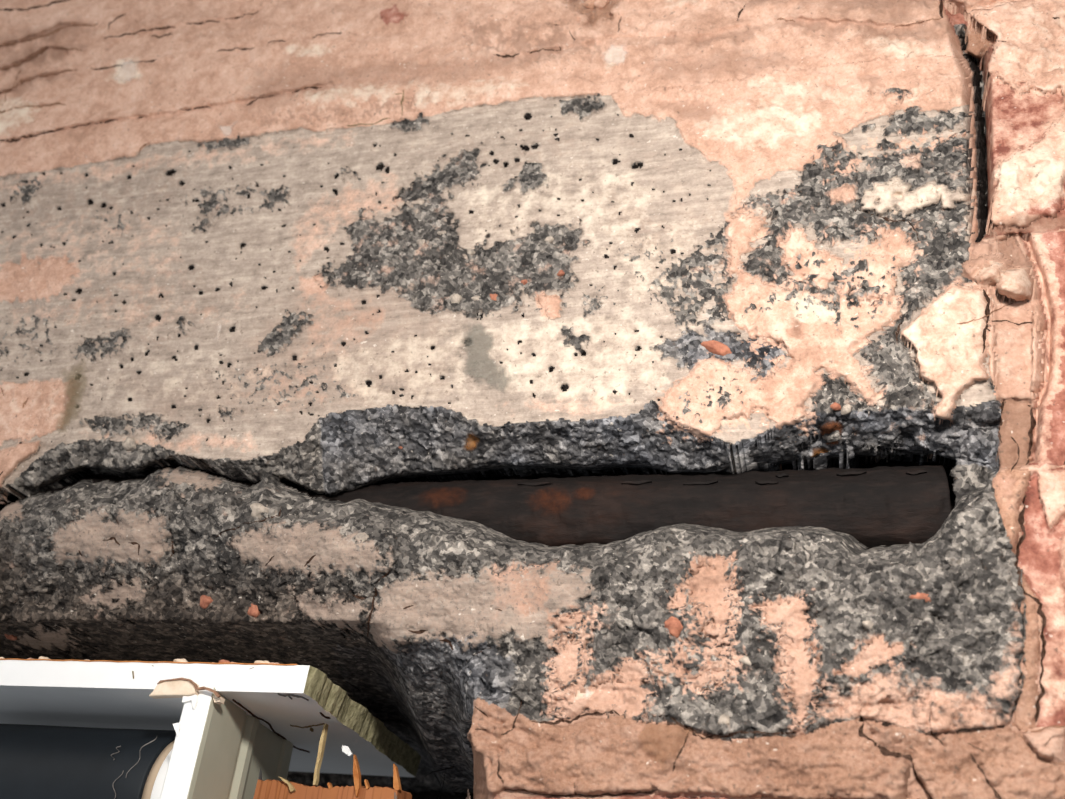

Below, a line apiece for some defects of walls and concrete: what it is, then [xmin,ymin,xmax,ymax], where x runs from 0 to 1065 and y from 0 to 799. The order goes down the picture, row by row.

crack [0,0,259,142]
spalling [883,106,972,137]
spalling [944,7,988,243]
spalling [313,142,592,319]
spalling [650,130,1002,512]
crack [0,463,337,537]
spalling [320,400,735,497]
crack [998,401,1036,471]
spalling [0,412,1026,795]
crack [1014,495,1065,765]
crack [858,707,932,799]
crack [929,712,1002,799]